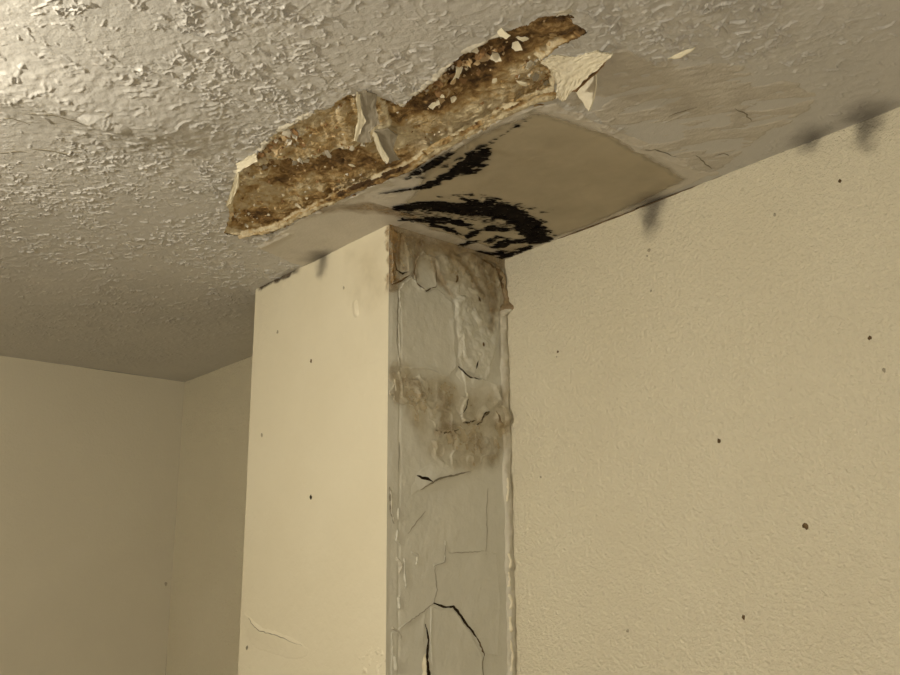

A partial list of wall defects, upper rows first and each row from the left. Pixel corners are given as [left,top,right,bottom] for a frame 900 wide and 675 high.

peeling [428,46,502,110]
peeling [497,28,529,51]
peeling [516,59,549,86]
peeling [349,90,400,163]
peeling [226,128,310,228]
water stain [347,119,557,291]
peeling [483,260,514,311]
crack [394,290,402,361]
peeling [388,232,502,467]
crack [404,490,488,675]
peeling [390,541,514,675]